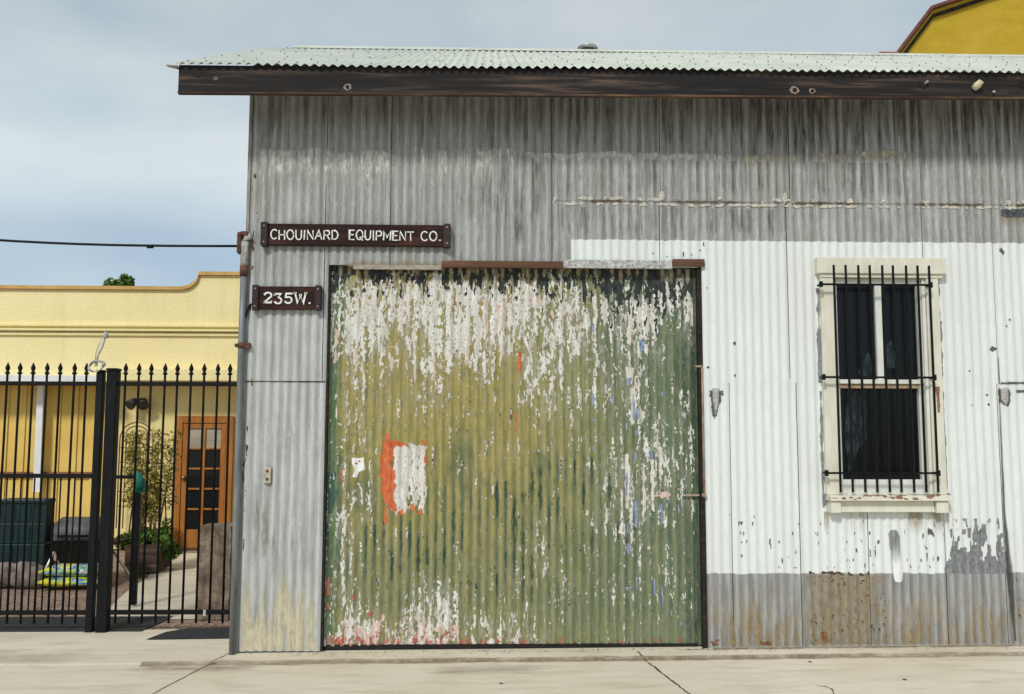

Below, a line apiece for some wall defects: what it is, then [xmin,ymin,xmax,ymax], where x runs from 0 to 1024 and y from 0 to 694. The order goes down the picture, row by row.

water stain [723,99,921,164]
water stain [952,100,1021,154]
water stain [258,146,395,184]
water stain [413,146,730,181]
peeling [324,242,704,646]
peeling [907,518,1007,574]
rust [809,571,931,645]